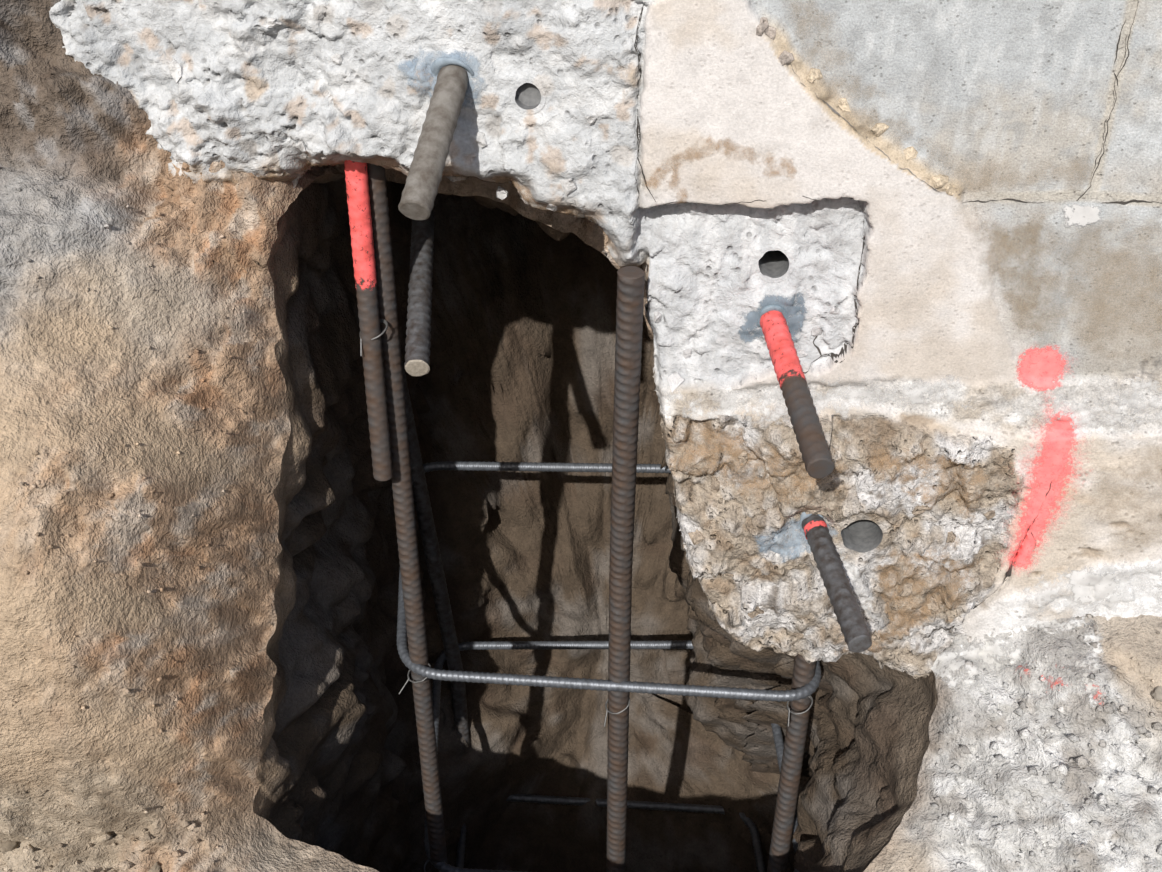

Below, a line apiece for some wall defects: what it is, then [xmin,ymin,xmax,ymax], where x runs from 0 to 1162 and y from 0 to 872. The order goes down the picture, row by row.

spalling [49,0,655,267]
crack [634,3,762,207]
peeling [756,17,776,40]
peeling [778,50,954,196]
crack [963,196,1043,204]
crack [1076,4,1159,205]
spalling [404,186,619,464]
spalling [253,172,432,872]
spalling [425,470,612,680]
spalling [626,197,1025,872]
crack [973,482,1052,609]
spalling [414,504,608,872]